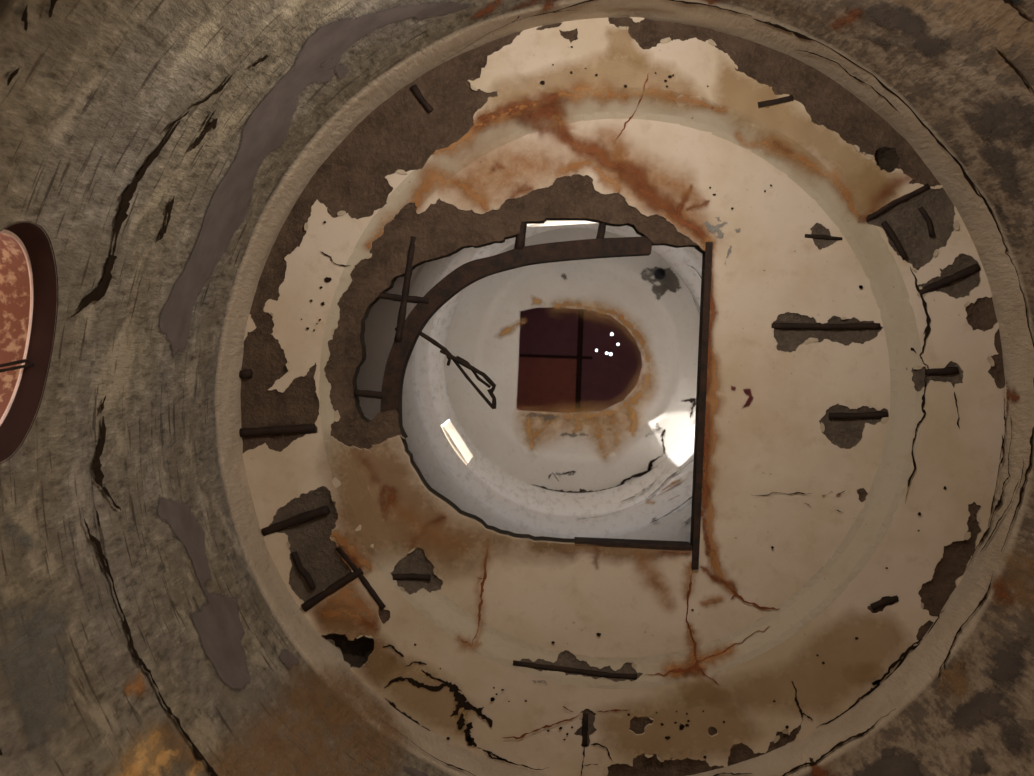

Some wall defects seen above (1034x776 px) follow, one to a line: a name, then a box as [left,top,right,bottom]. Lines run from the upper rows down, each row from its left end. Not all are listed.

spalling [241,31,701,453]
corrosion [411,85,726,250]
spalling [608,17,1005,392]
corrosion [525,273,736,605]
crack [905,267,931,503]
corrosion [318,583,395,680]
crack [367,644,628,776]
leakage [853,746,923,776]
crack [782,398,1034,776]
spalling [916,502,981,640]
leakage [969,748,990,776]
leakage [950,638,1030,759]